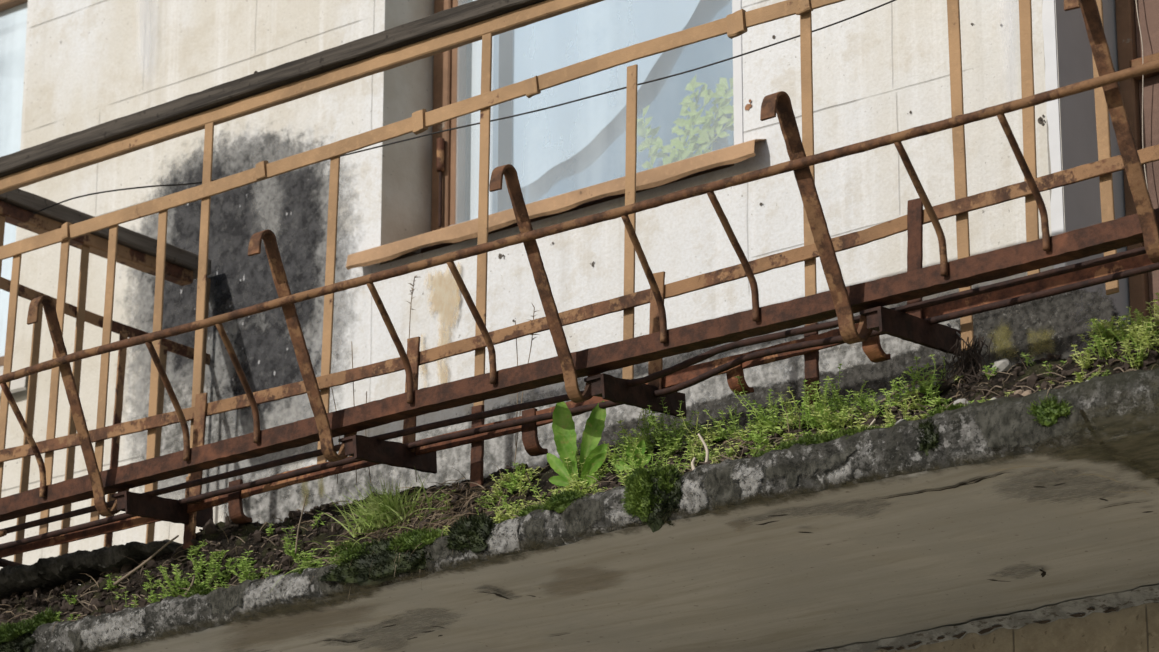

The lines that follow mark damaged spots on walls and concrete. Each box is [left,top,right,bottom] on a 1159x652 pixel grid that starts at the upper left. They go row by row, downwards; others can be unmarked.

damp [126,133,352,461]
corrosion [427,264,460,346]
damp [158,474,188,500]